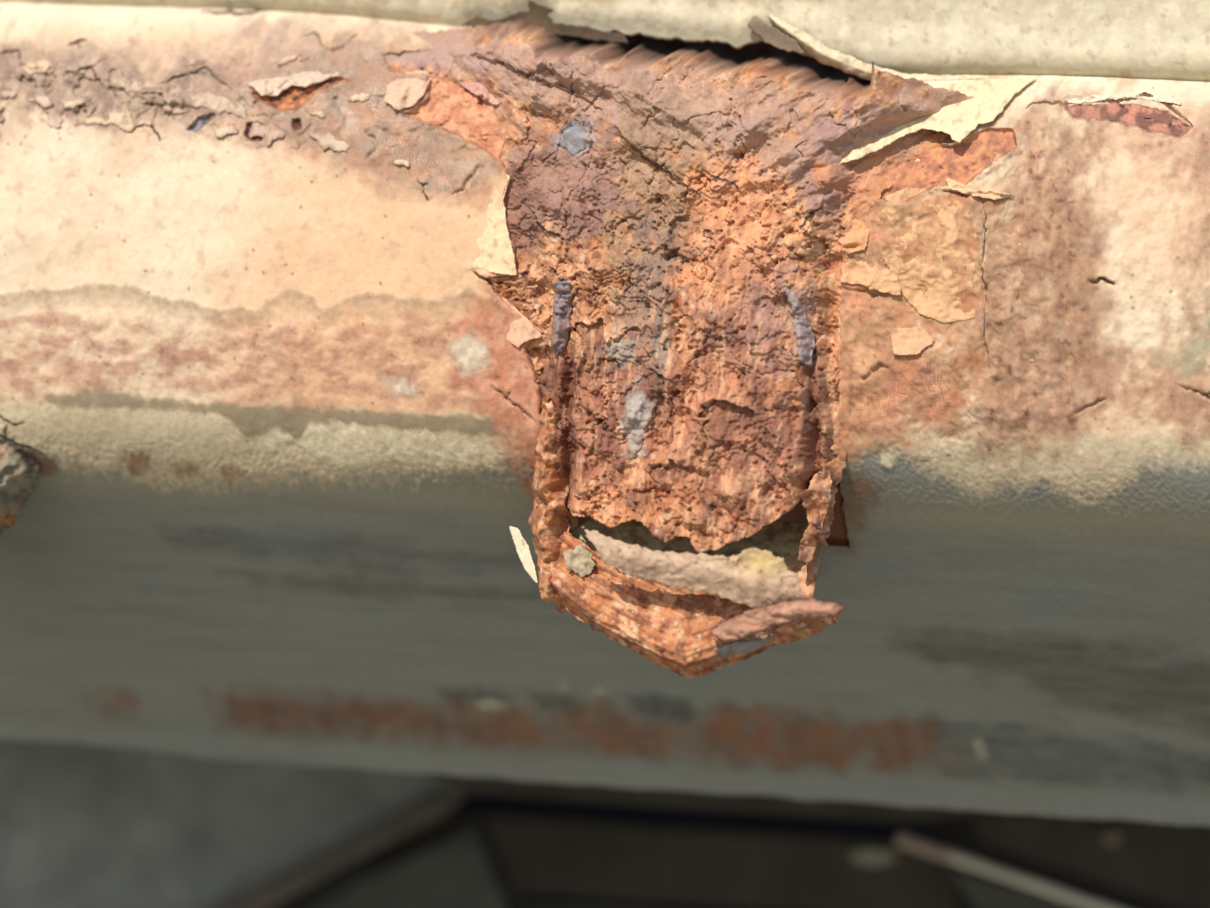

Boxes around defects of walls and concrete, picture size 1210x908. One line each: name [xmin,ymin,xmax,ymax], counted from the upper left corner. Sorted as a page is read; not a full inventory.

peeling [465,0,628,44]
peeling [0,52,163,132]
peeling [1062,93,1190,137]
peeling [161,52,517,276]
peeling [747,13,1036,355]
peeling [502,297,543,348]
crack [943,190,989,362]
rust [829,115,1210,459]
crack [0,416,47,456]
rust [0,284,547,489]
peeling [623,391,657,459]
peeling [563,544,596,577]